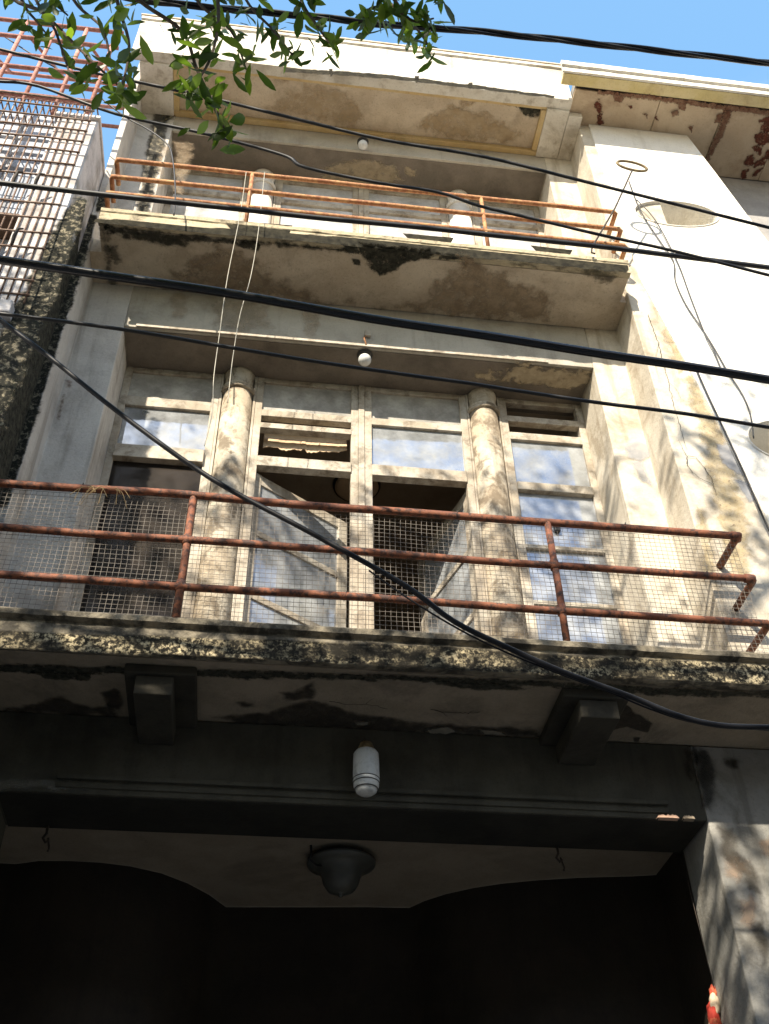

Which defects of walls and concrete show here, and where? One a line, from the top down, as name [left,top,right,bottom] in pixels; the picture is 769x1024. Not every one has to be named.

corrosion [597,90,769,161]
water stain [0,199,628,499]
peeling [475,361,592,389]
crack [648,316,716,491]
water stain [0,663,124,681]